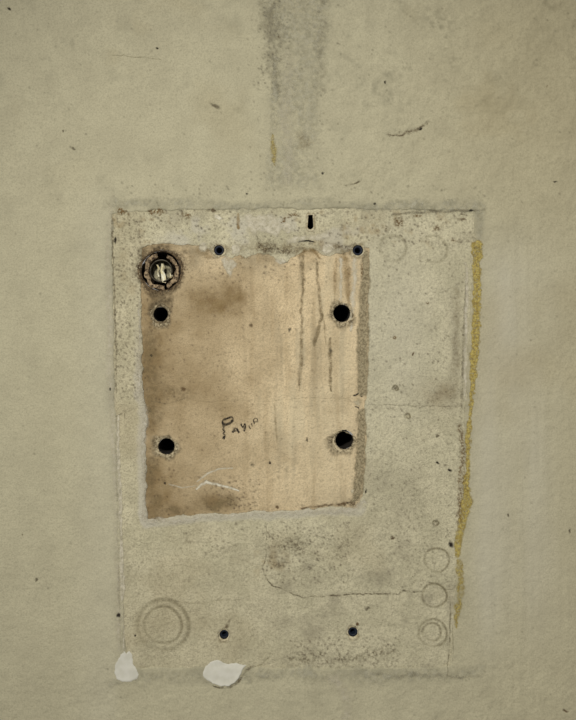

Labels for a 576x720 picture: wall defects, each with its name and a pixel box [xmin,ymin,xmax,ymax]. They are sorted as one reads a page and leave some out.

peeling [109,203,476,688]